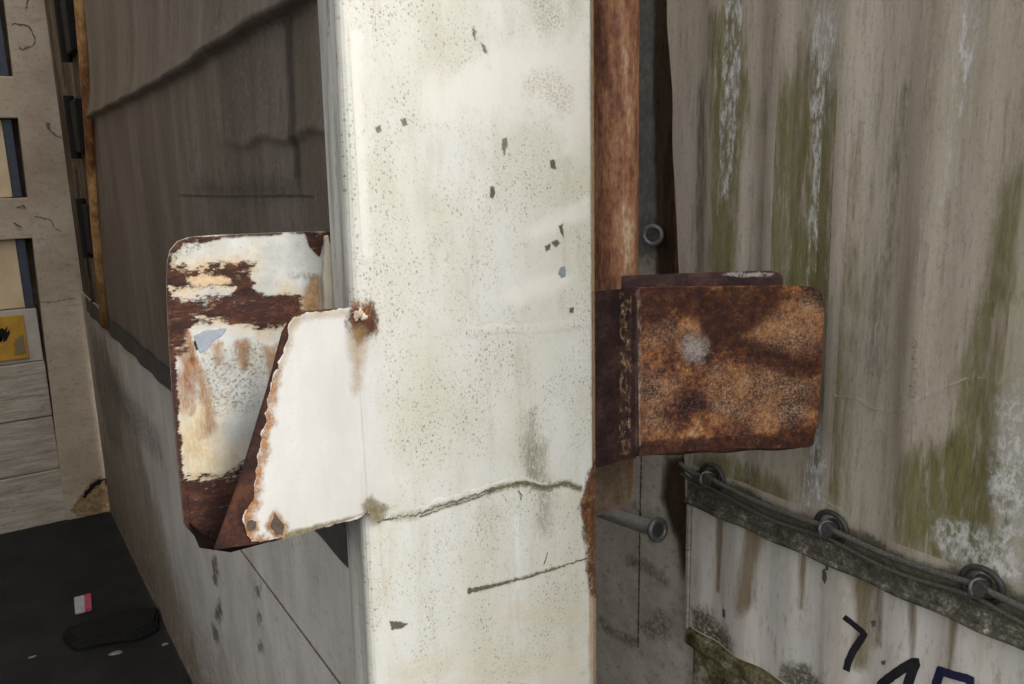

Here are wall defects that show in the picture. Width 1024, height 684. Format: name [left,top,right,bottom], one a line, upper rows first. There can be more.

water stain [720,0,743,198]
water stain [808,0,837,273]
water stain [945,2,980,174]
peeling [194,328,226,352]
corrosion [167,232,330,550]
peeling [244,371,288,541]
corrosion [346,301,379,344]
crack [377,475,582,523]
corrosion [578,463,596,597]
corrosion [629,286,824,575]
water stain [802,423,827,508]
water stain [931,383,1024,587]